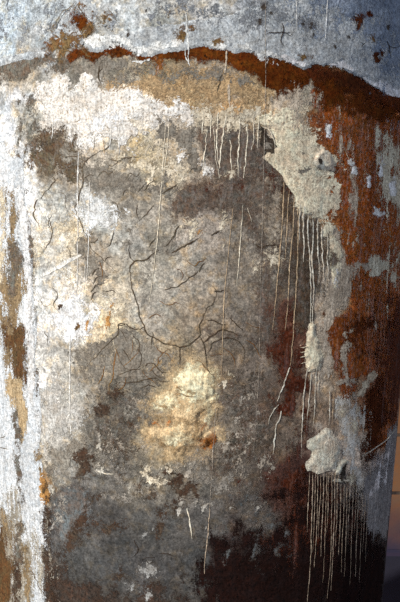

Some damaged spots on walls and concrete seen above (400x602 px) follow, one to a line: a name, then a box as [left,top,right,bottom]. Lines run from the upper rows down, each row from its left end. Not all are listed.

leakage [0,187,35,407]
crack [32,143,262,397]
leakage [0,0,334,355]
leakage [0,366,385,602]
corrosion [36,1,400,468]
corrosion [265,307,322,511]